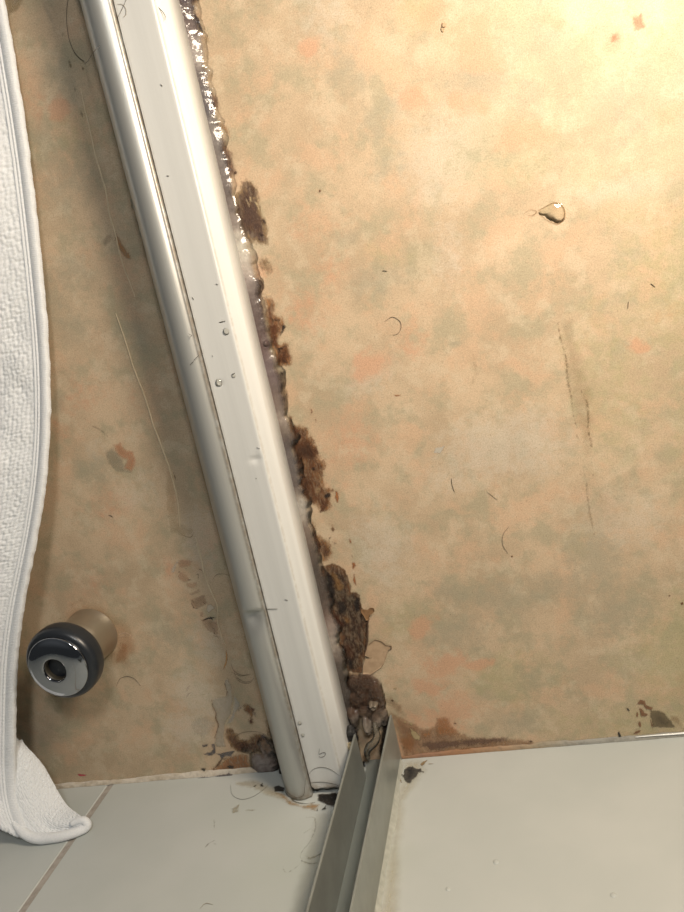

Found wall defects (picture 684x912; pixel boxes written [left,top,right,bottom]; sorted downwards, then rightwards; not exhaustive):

peeling [361,608,392,675]